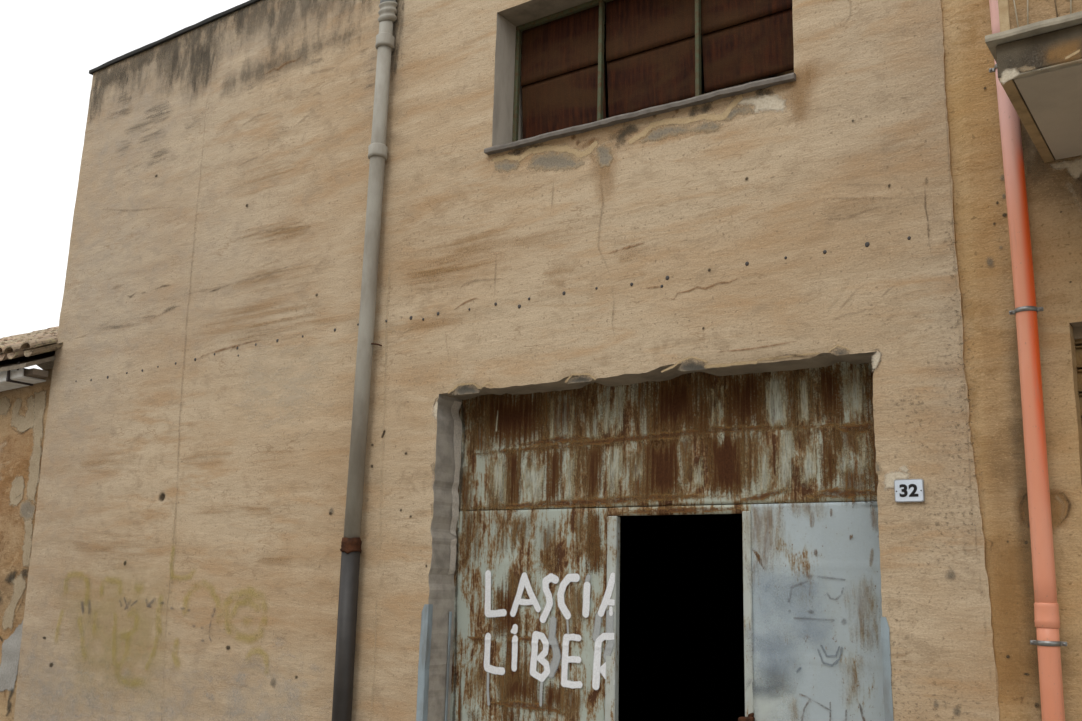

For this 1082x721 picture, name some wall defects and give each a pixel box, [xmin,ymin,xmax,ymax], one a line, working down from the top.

water stain [93,0,346,110]
flaking render [493,135,613,172]
flaking render [628,94,785,144]
flaking render [0,391,46,641]
corrosion [459,363,878,573]
corrosion [468,521,588,721]
corrosion [458,670,480,721]